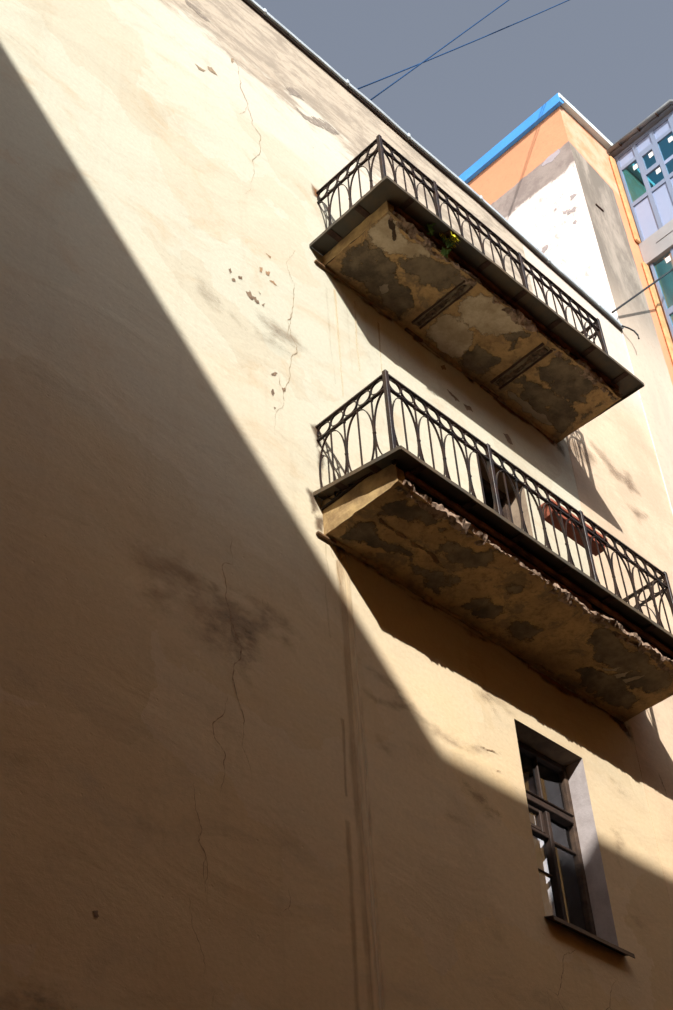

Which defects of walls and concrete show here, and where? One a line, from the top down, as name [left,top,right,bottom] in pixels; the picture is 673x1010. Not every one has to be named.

peeling [340,210,623,433]
spalling [341,480,673,710]